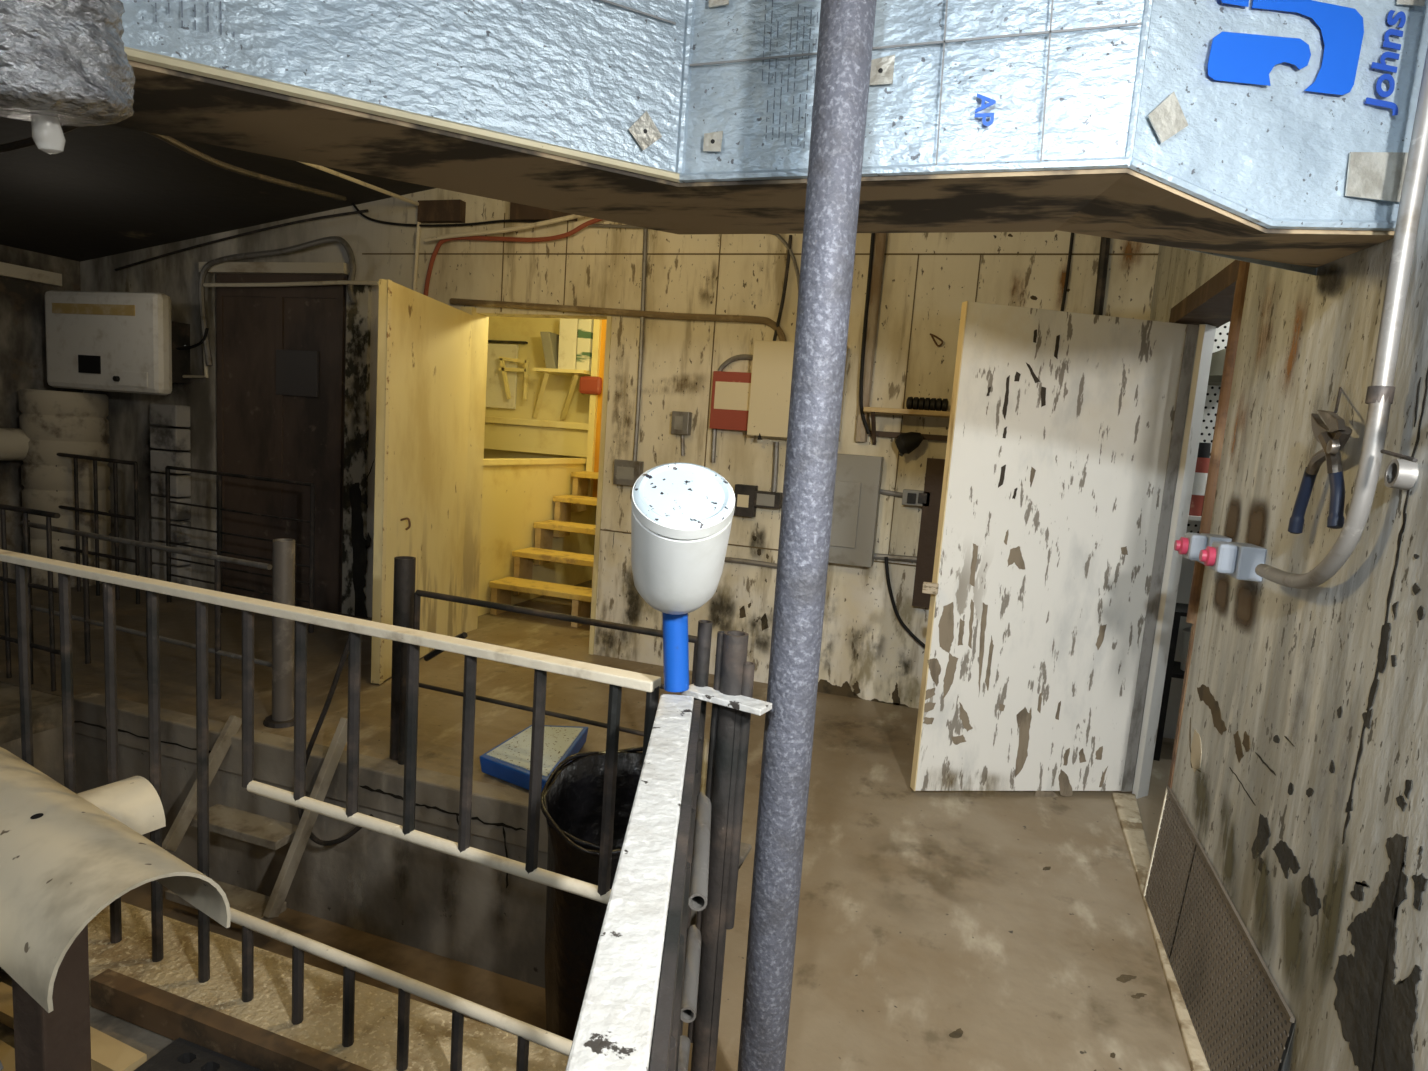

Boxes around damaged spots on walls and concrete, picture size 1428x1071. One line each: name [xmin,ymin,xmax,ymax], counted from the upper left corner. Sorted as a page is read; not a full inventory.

peeling [987,363,1046,438]
peeling [998,465,1036,499]
peeling [1004,530,1025,569]
peeling [817,544,994,745]
peeling [1096,624,1107,650]
crack [1342,368,1428,844]
peeling [999,693,1061,777]
peeling [1035,746,1108,797]
spalling [1197,684,1250,763]
peeling [1288,782,1314,797]
peeling [1251,814,1428,1071]